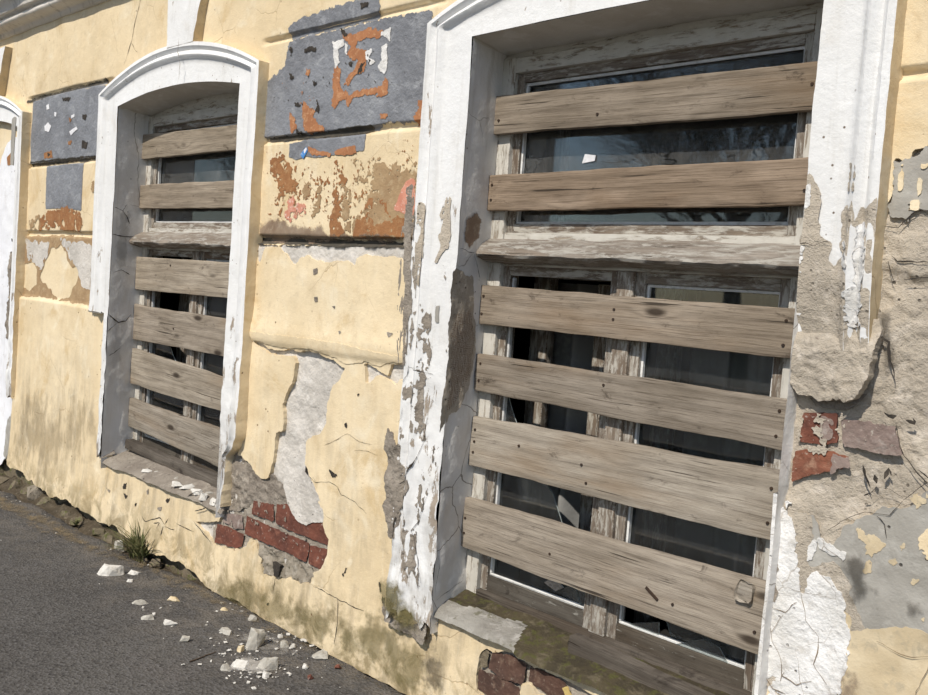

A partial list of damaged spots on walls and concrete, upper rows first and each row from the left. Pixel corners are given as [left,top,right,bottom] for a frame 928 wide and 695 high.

peeling [288,27,391,135]
peeling [413,100,422,126]
peeling [22,205,92,306]
crack [888,256,928,280]
peeling [258,140,476,588]
spalling [172,342,345,584]
spalling [767,146,928,695]
spalling [379,582,426,645]
spalling [478,649,592,695]